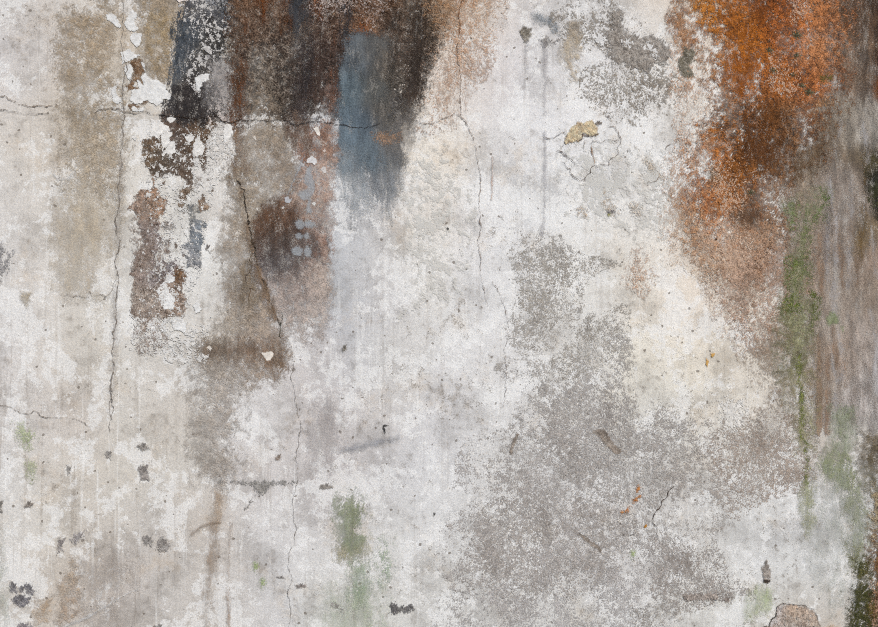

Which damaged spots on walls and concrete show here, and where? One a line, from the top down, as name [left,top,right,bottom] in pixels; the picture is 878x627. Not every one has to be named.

crack [0,95,51,115]
flaking render [50,0,302,390]
crack [61,3,380,431]
damp [250,28,415,340]
corrosion [222,0,506,138]
spalling [519,0,698,144]
crack [543,111,675,195]
peeling [432,229,825,627]
corrosion [643,0,860,417]
damp [783,0,878,493]